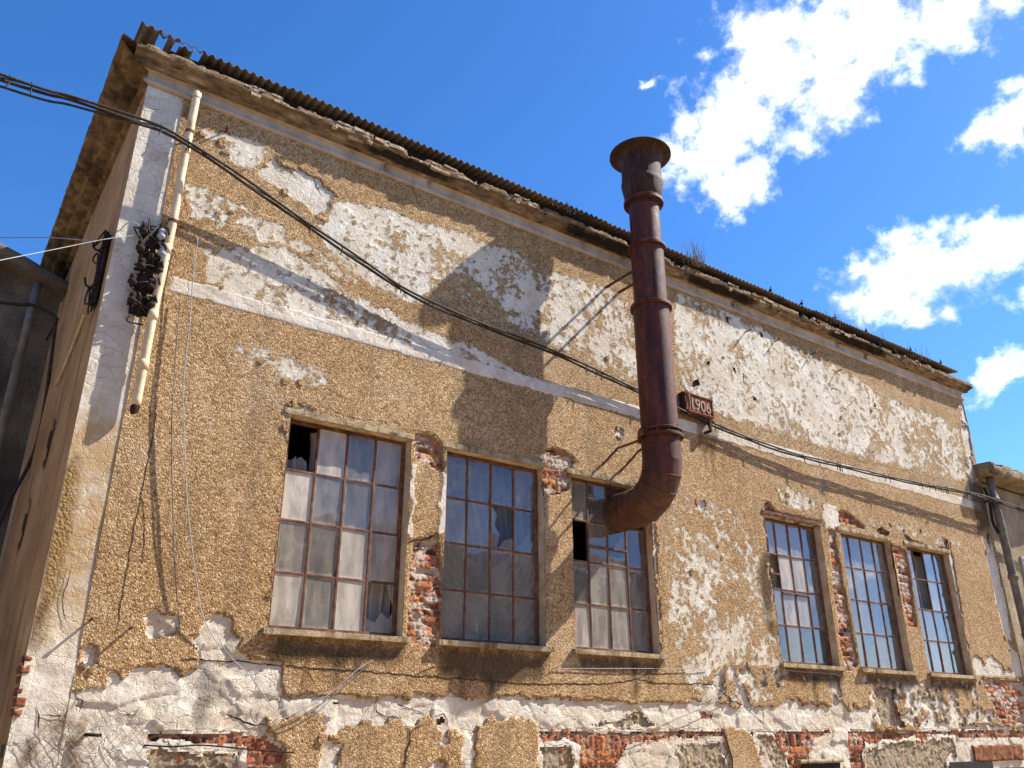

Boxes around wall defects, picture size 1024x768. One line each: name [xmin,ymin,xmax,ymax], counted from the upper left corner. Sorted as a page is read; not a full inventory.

flaking render [183,117,638,386]
spalling [726,282,773,305]
flaking render [671,292,976,500]
crack [116,399,158,632]
flaking render [60,341,1024,768]
spalling [10,655,32,716]